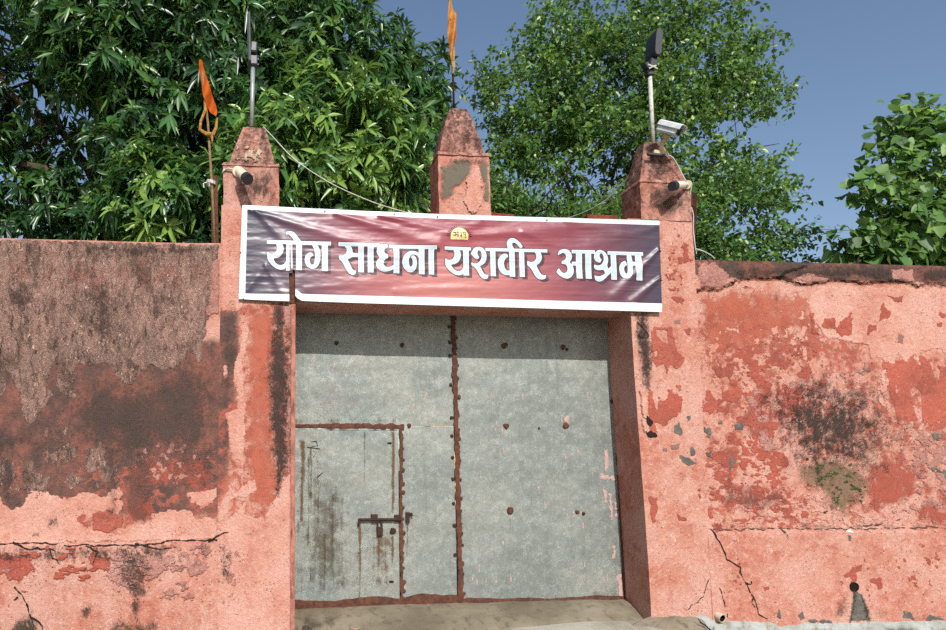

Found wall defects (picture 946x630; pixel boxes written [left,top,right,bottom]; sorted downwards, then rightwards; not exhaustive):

peeling [463,165,484,214]
peeling [664,234,729,305]
peeling [0,237,290,630]
leakage [79,371,212,520]
peeling [639,268,946,533]
crack [8,587,43,630]
crack [0,532,229,564]
crack [688,580,728,630]
crack [710,519,946,619]
peeling [909,571,944,621]